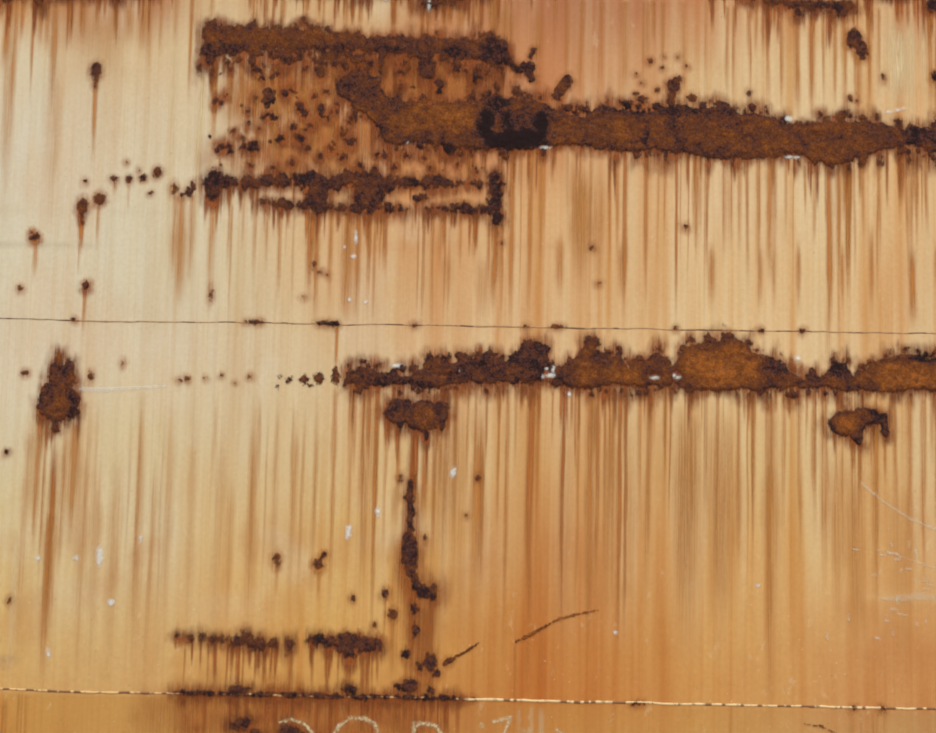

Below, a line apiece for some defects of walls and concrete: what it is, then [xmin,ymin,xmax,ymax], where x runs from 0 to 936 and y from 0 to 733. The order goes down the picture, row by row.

corrosion [0,0,150,88]
corrosion [76,193,106,244]
corrosion [111,167,162,184]
corrosion [172,0,936,311]
corrosion [33,348,94,607]
corrosion [167,320,936,733]